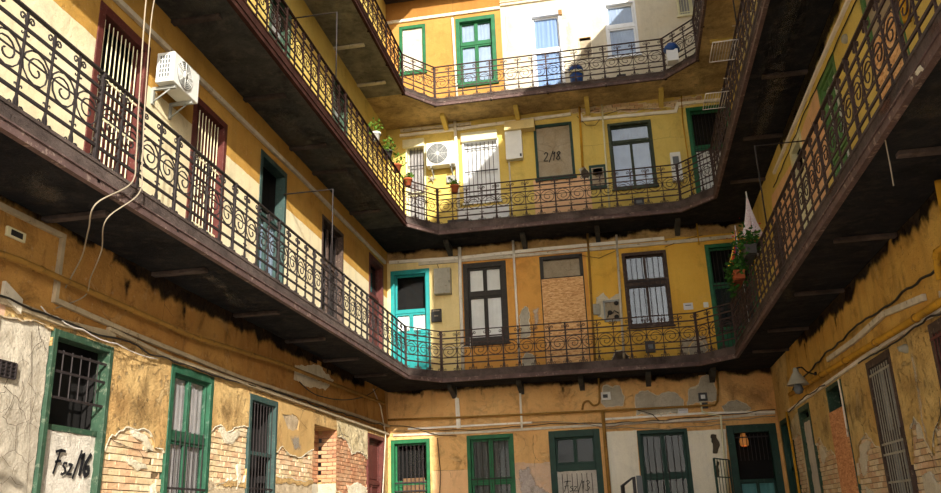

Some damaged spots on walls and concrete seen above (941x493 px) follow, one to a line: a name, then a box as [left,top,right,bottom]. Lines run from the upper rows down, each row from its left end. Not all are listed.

crack [0,326,47,485]
peeling [294,364,334,390]
flaking render [601,374,751,416]
flaking render [100,426,165,493]
flaking render [208,424,248,493]
flaking render [336,436,367,493]
flaking render [856,432,889,493]
flaking render [909,402,941,493]